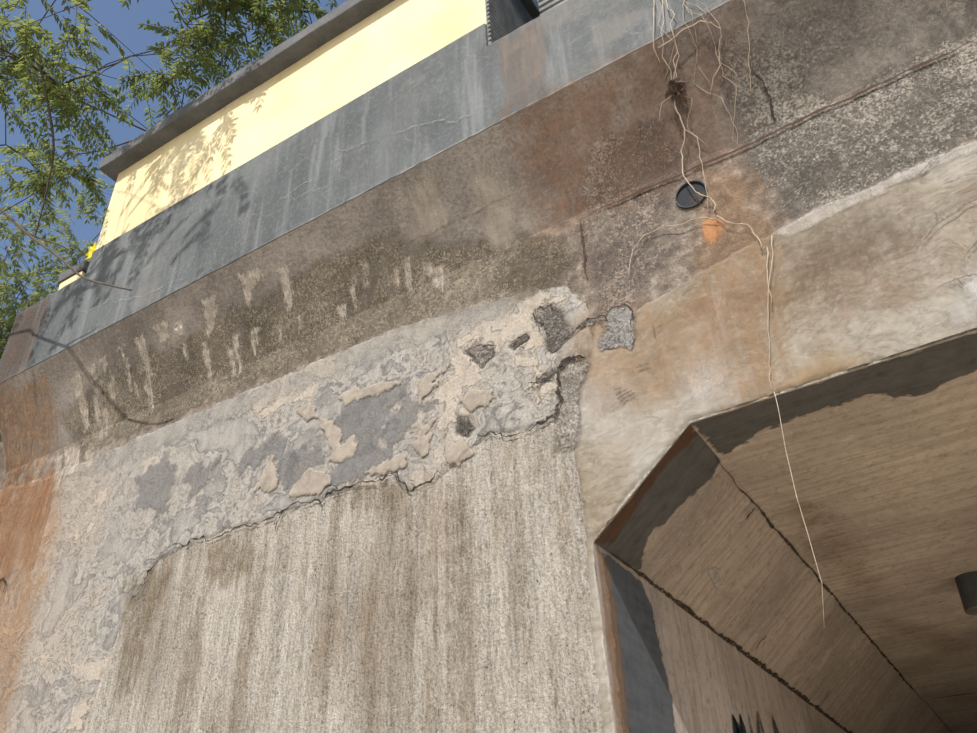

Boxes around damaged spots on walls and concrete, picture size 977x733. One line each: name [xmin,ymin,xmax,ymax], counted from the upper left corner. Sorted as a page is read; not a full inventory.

crack [579,39,977,277]
flaking render [133,457,219,518]
crack [131,471,448,600]
water stain [10,177,576,493]
flaking render [236,362,450,500]
flaking render [444,389,494,466]
spalling [463,343,495,368]
spalling [508,332,530,349]
crack [472,315,605,446]
spalling [536,358,589,452]
crack [606,548,853,733]
crack [714,456,972,700]